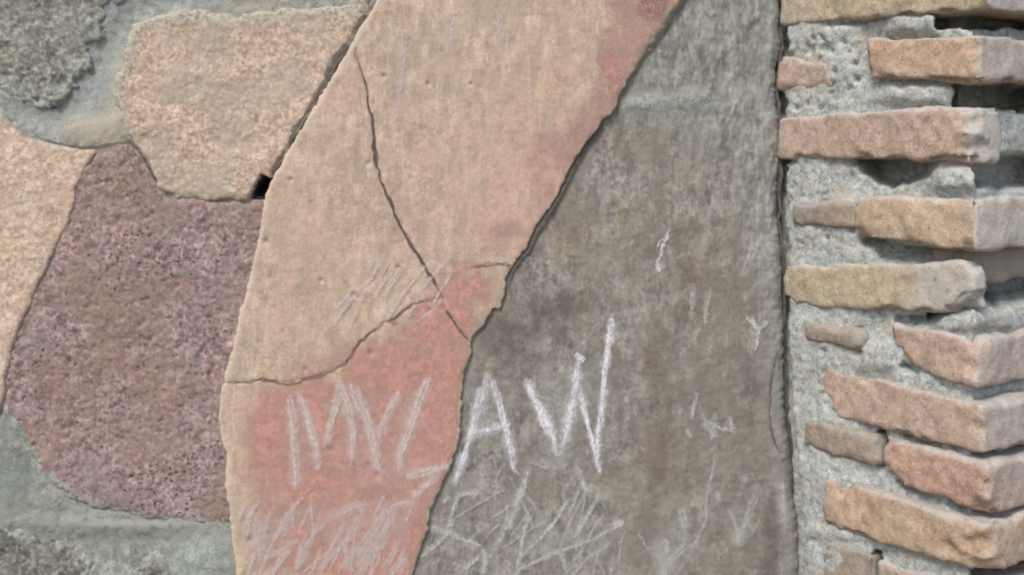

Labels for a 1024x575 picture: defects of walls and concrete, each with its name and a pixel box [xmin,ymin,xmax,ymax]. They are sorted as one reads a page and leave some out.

crack [232,0,469,386]